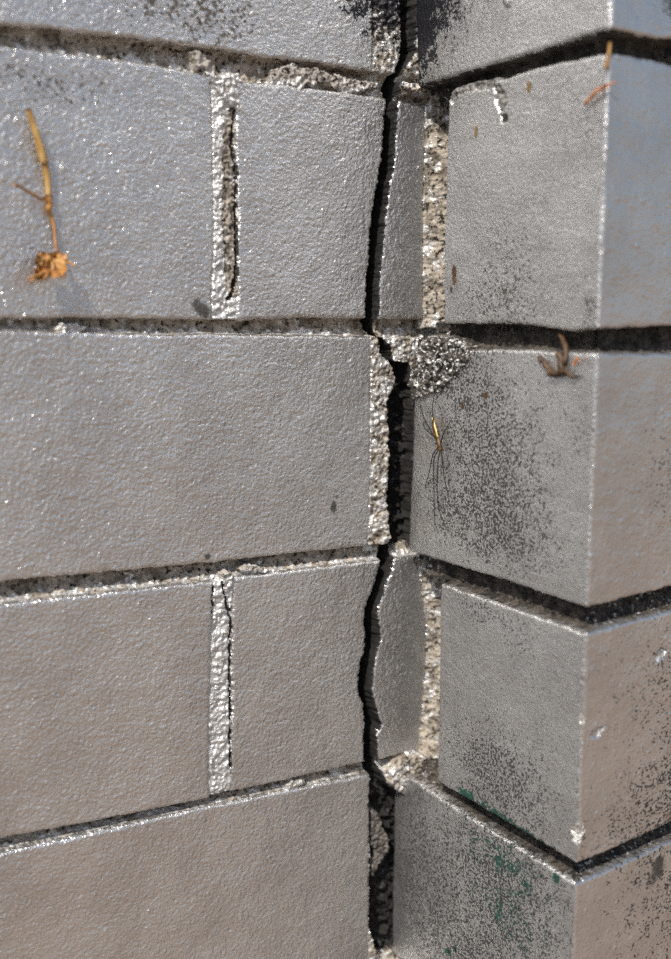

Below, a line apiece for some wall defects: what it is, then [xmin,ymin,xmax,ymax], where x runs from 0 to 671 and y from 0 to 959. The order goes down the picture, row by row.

crack [225,109,239,300]
crack [357,0,418,955]